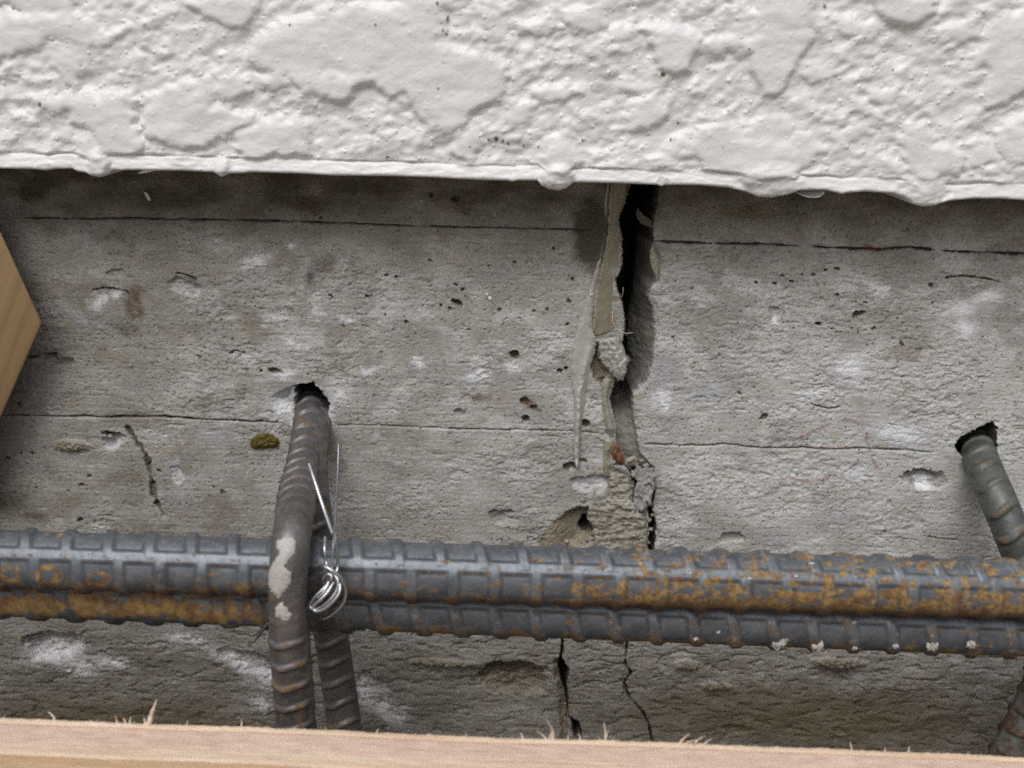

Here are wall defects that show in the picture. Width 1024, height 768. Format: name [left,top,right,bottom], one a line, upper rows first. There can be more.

spalling [166,275,205,299]
spalling [99,430,128,451]
crack [125,424,167,516]
spalling [169,464,187,486]
spalling [270,382,301,425]
spalling [315,382,336,433]
crack [590,184,660,550]
spalling [0,528,272,662]
spalling [307,456,1024,660]
spalling [474,657,554,702]
crack [554,639,583,740]
crack [605,641,654,742]